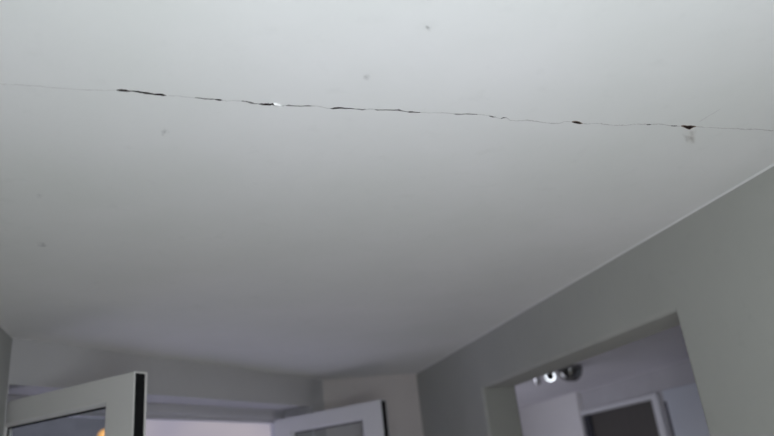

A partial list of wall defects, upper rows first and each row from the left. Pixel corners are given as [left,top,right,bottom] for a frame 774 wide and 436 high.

crack [3,84,773,131]